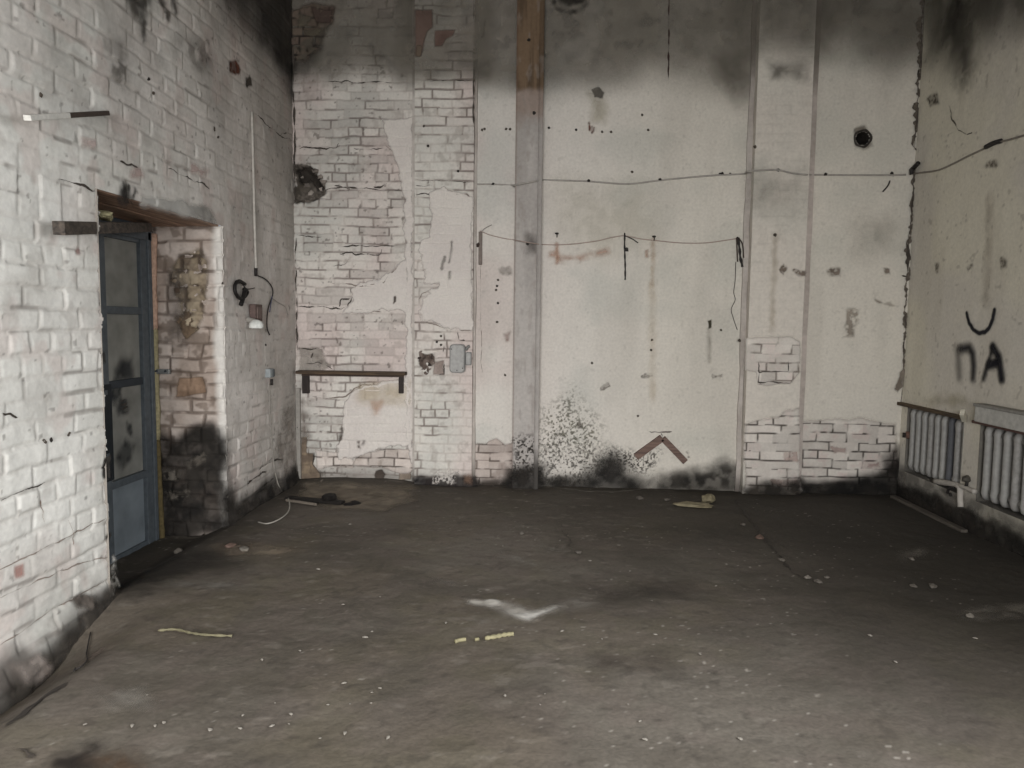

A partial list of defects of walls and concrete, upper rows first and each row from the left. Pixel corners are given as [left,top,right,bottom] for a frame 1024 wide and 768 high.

peeling [291,3,335,61]
peeling [415,10,455,56]
crack [60,179,93,192]
spalling [293,164,327,204]
spalling [171,249,208,339]
flaking render [418,351,445,376]
flaking render [745,337,800,386]
flaking render [248,406,412,492]
mould [548,400,595,474]
mould [609,452,656,470]
flaking render [744,409,897,490]
crack [0,519,108,645]